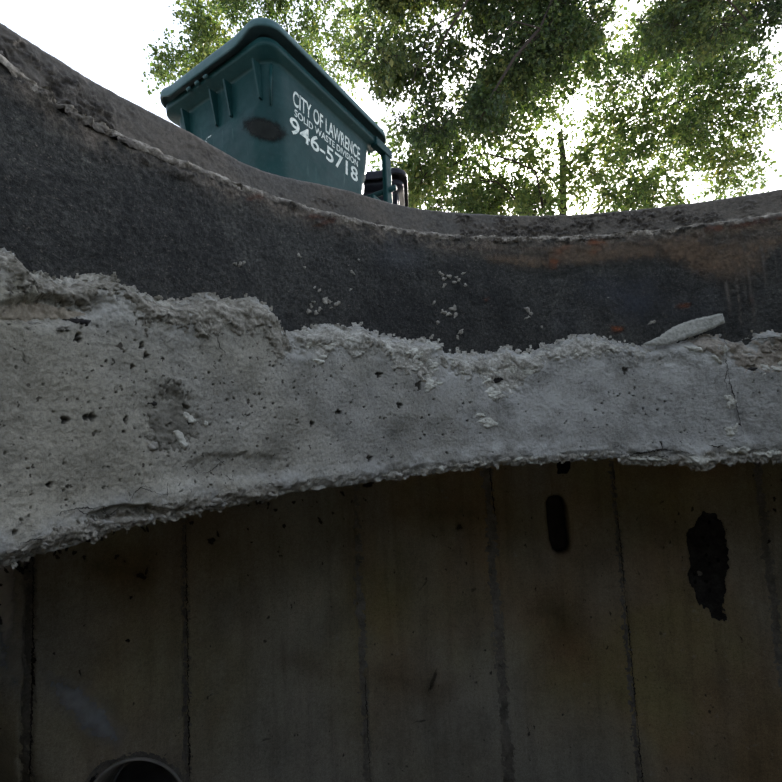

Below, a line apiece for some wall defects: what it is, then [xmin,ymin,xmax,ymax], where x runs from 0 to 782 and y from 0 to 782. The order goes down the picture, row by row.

spalling [0,248,657,403]
crack [724,340,782,451]